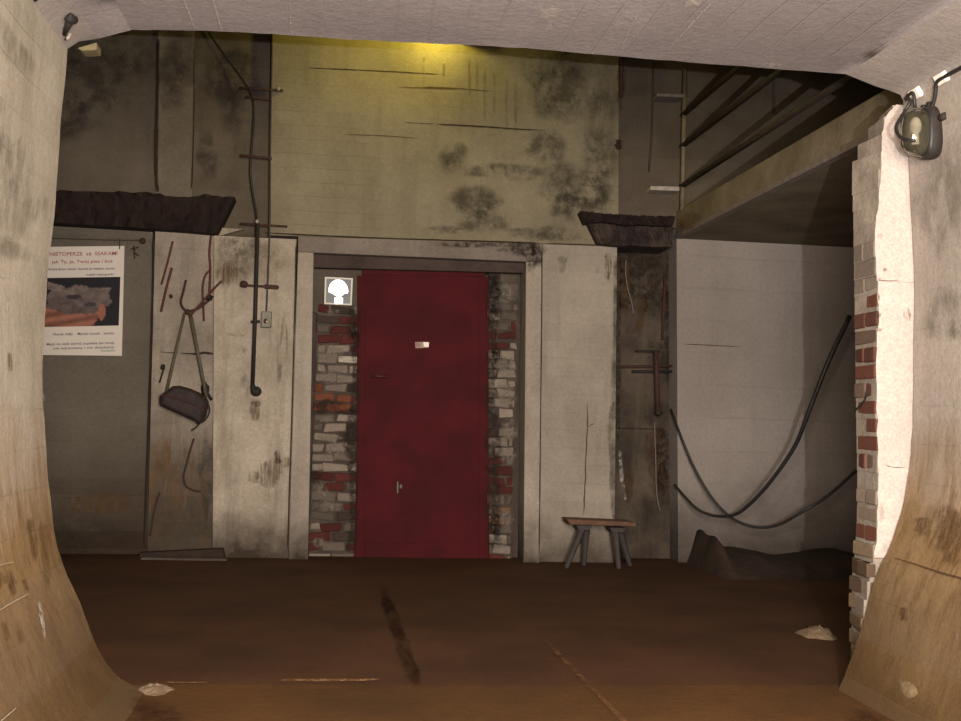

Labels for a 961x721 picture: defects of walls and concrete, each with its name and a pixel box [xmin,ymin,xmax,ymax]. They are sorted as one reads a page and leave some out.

flaking render [854,240,880,468]
flaking render [849,488,881,657]
crack [896,558,961,579]